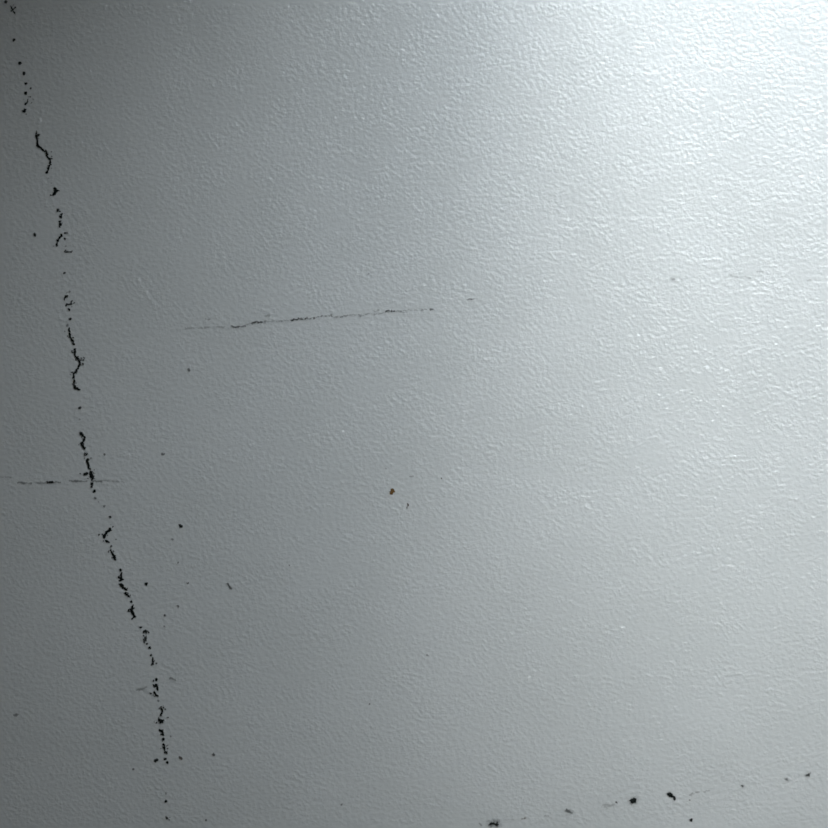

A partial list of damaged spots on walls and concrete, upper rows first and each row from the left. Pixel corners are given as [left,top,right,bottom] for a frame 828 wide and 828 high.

crack [18,62,85,409]
crack [78,432,169,764]